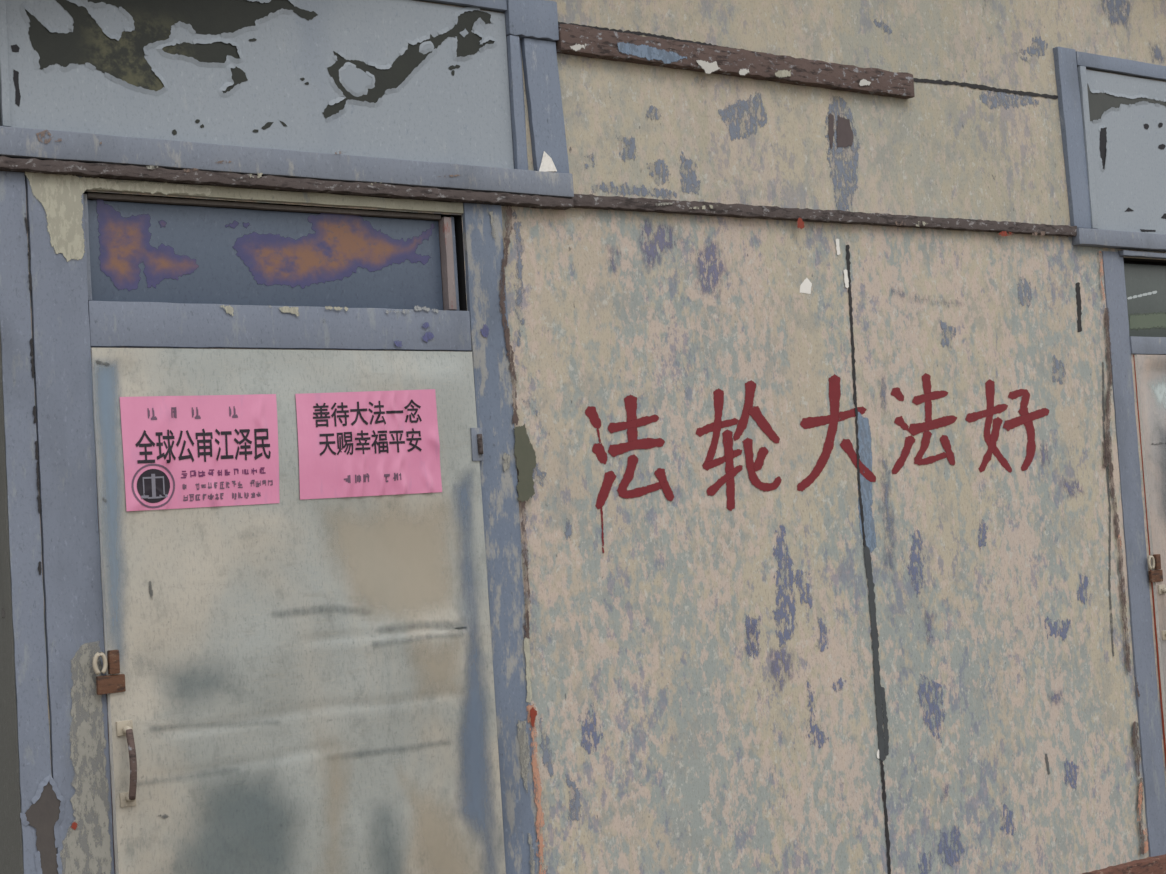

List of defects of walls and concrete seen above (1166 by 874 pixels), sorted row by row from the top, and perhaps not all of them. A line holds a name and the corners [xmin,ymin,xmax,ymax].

peeling [13,70,21,106]
peeling [11,0,318,98]
peeling [322,7,498,123]
peeling [825,96,860,211]
peeling [1087,81,1166,173]
peeling [20,642,112,874]
corrosion [524,638,546,874]